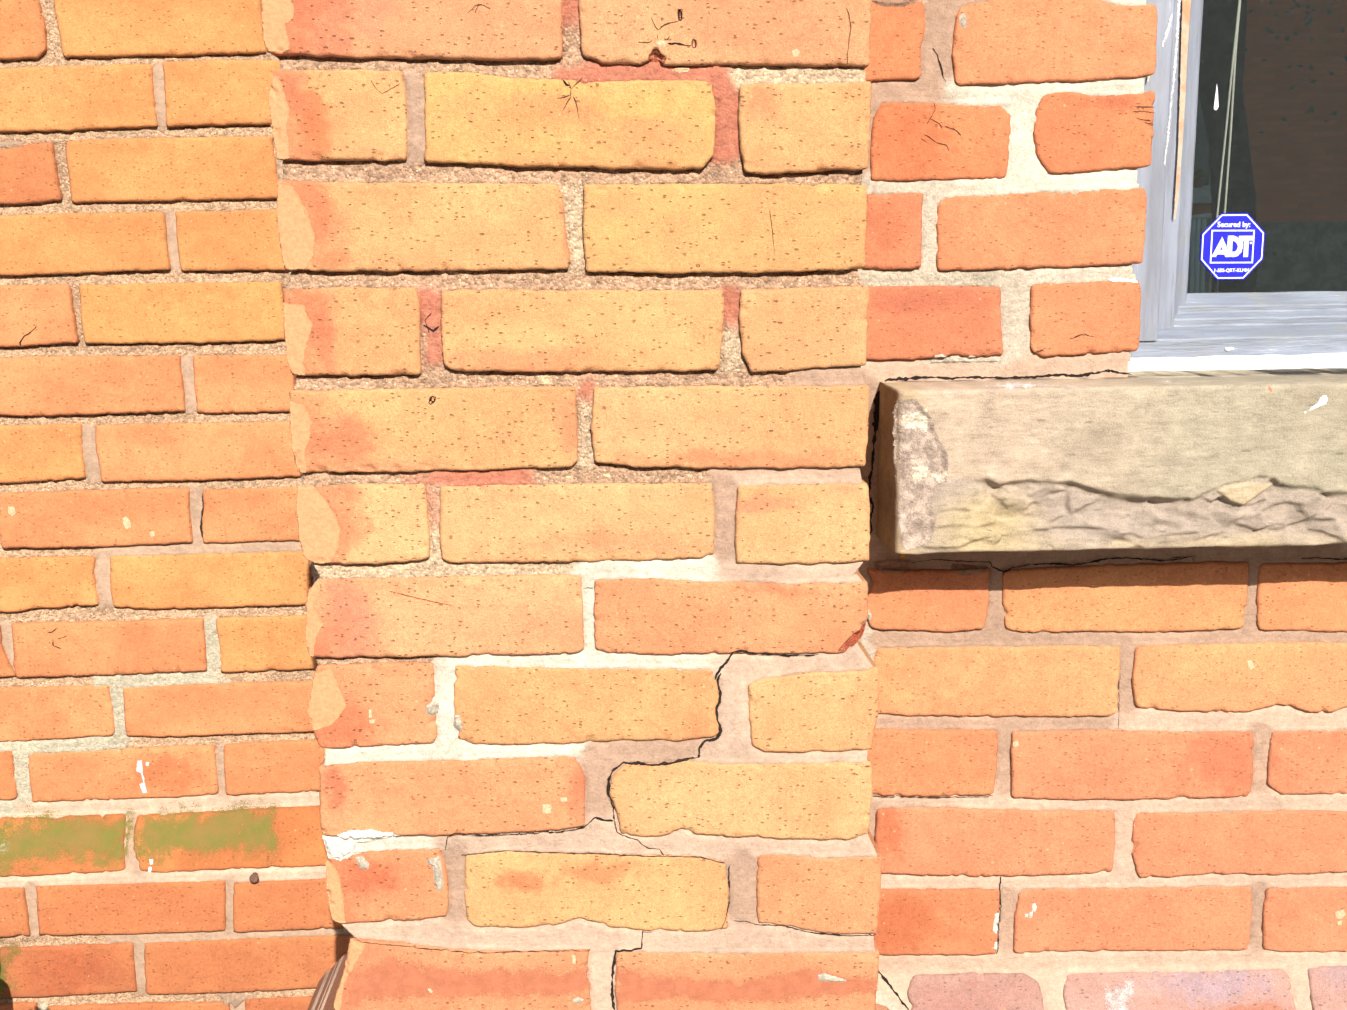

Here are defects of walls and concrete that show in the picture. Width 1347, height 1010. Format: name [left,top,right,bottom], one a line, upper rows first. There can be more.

spalling [891,399,950,551]
crack [868,334,1132,534]
crack [912,556,1195,575]
crack [1301,554,1347,562]
crack [445,649,876,936]
crack [878,971,909,1010]